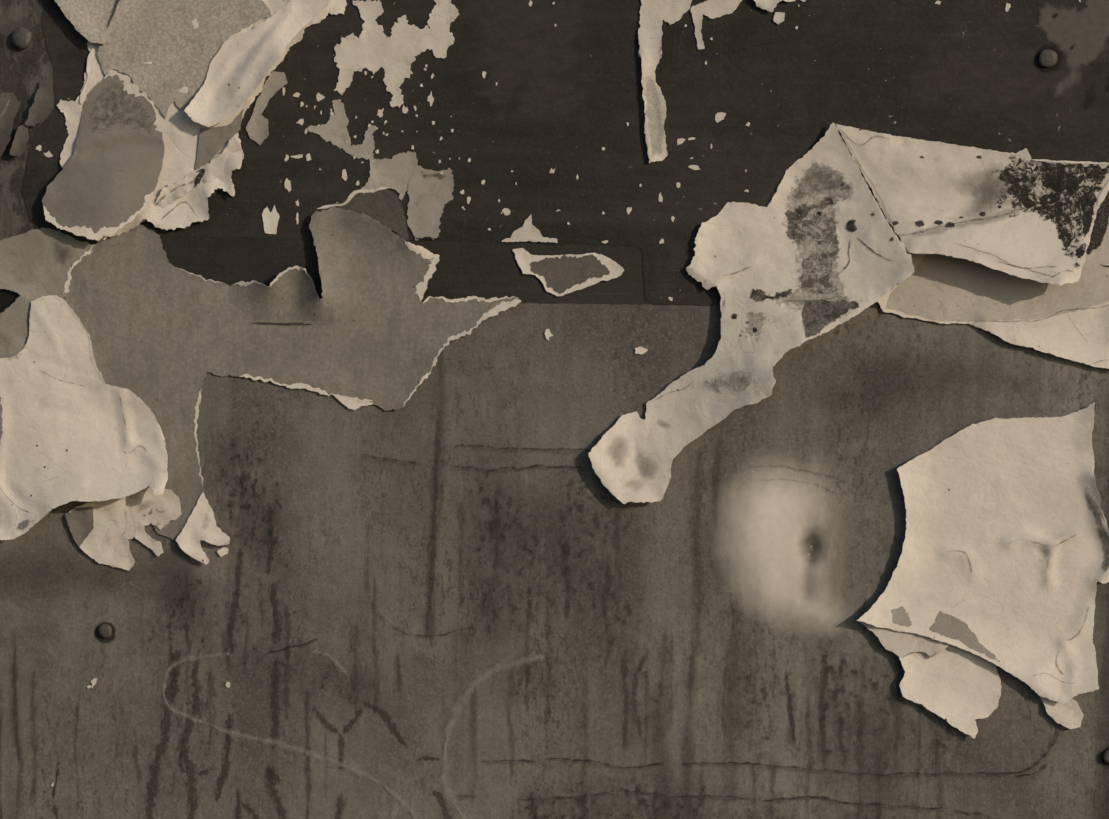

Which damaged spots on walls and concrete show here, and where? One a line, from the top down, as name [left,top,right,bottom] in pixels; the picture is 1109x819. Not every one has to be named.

peeling [1036,0,1109,109]